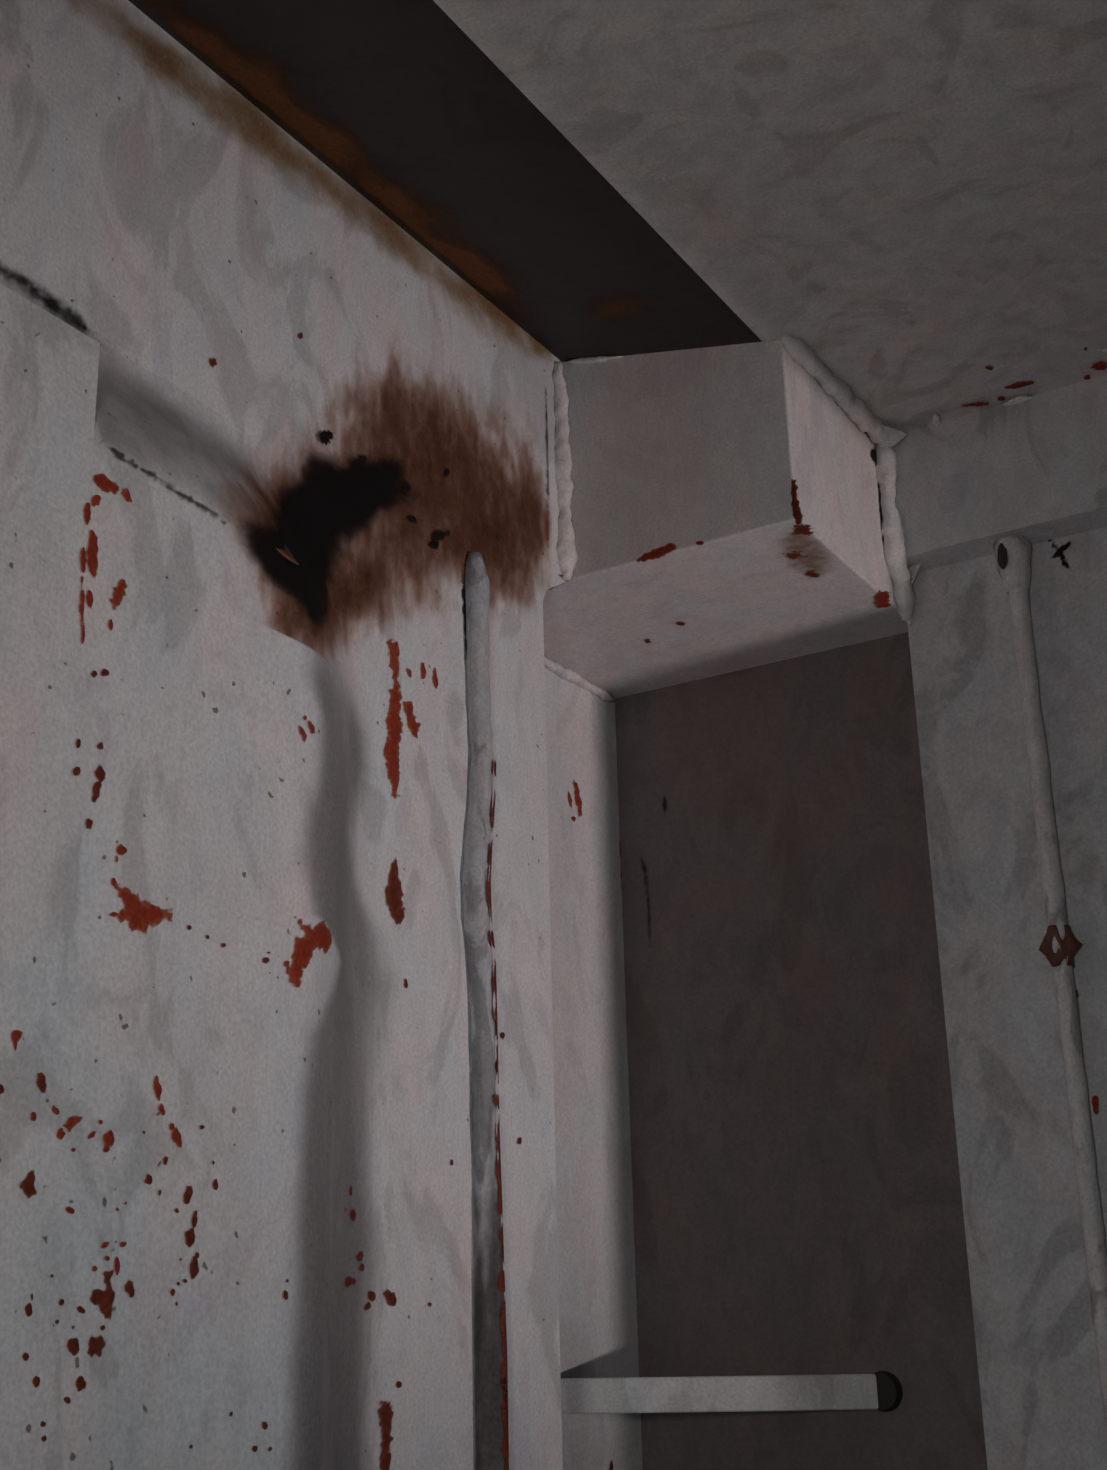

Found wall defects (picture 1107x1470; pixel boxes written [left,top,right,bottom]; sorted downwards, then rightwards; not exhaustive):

rust [79,474,132,644]
rust [787,479,823,578]
rust [384,639,438,798]
rust [73,738,105,829]
rust [110,844,226,947]
rust [263,917,332,987]
rust [30,1073,114,1152]
rust [145,1076,182,1196]
rust [487,760,522,1470]
rust [55,1241,134,1357]
rust [170,1186,199,1306]
rust [378,1381,402,1470]